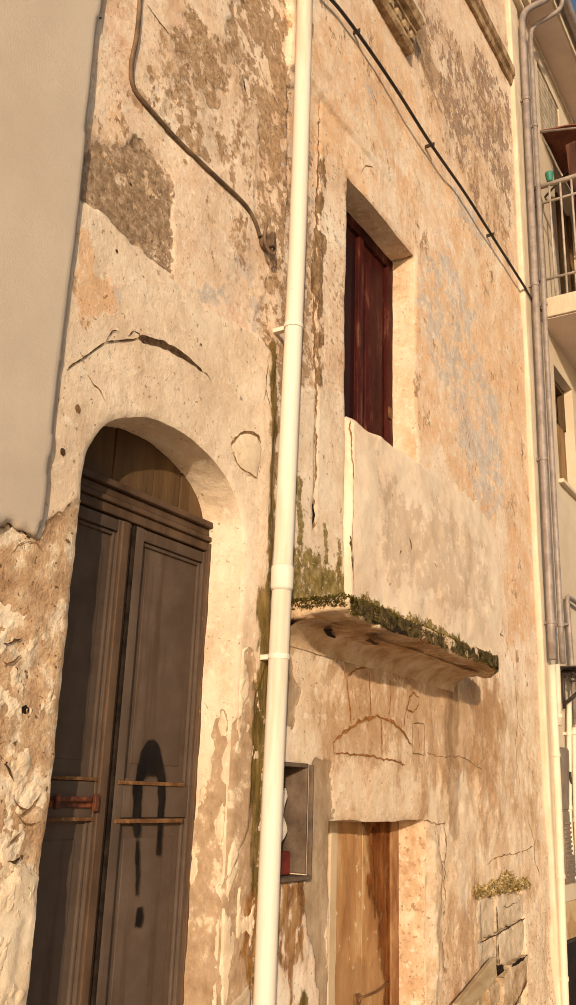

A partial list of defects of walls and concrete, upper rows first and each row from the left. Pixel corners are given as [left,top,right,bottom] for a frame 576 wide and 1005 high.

flaking render [80,134,175,273]
flaking render [150,0,293,433]
crack [313,107,321,261]
flaking render [416,0,512,212]
crack [67,330,211,400]
crack [311,289,319,528]
flaking render [0,499,81,1005]
flaking render [183,647,265,1005]
leakage [249,340,277,911]
leakage [291,476,499,670]
crack [333,663,488,770]